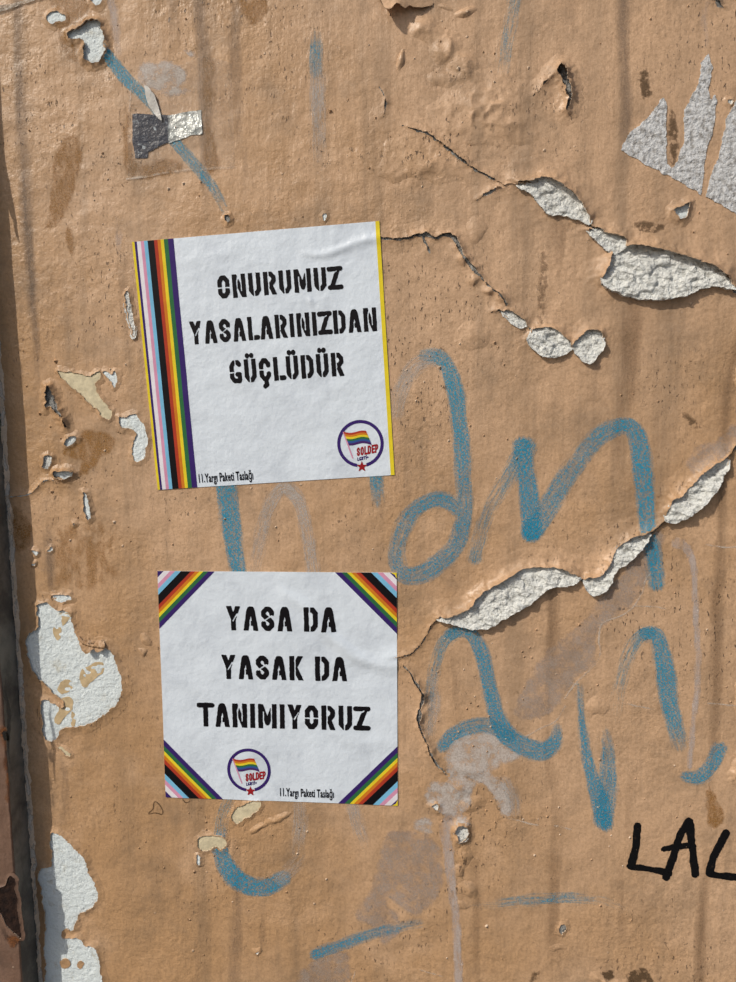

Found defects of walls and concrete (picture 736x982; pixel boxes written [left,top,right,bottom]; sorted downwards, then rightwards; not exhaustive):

peeling [41,0,114,72]
peeling [381,0,434,9]
peeling [521,53,584,126]
crack [365,74,736,375]
peeling [665,196,696,228]
peeling [38,365,153,530]
peeling [5,483,133,759]
crack [395,423,736,786]
peeling [29,825,110,982]